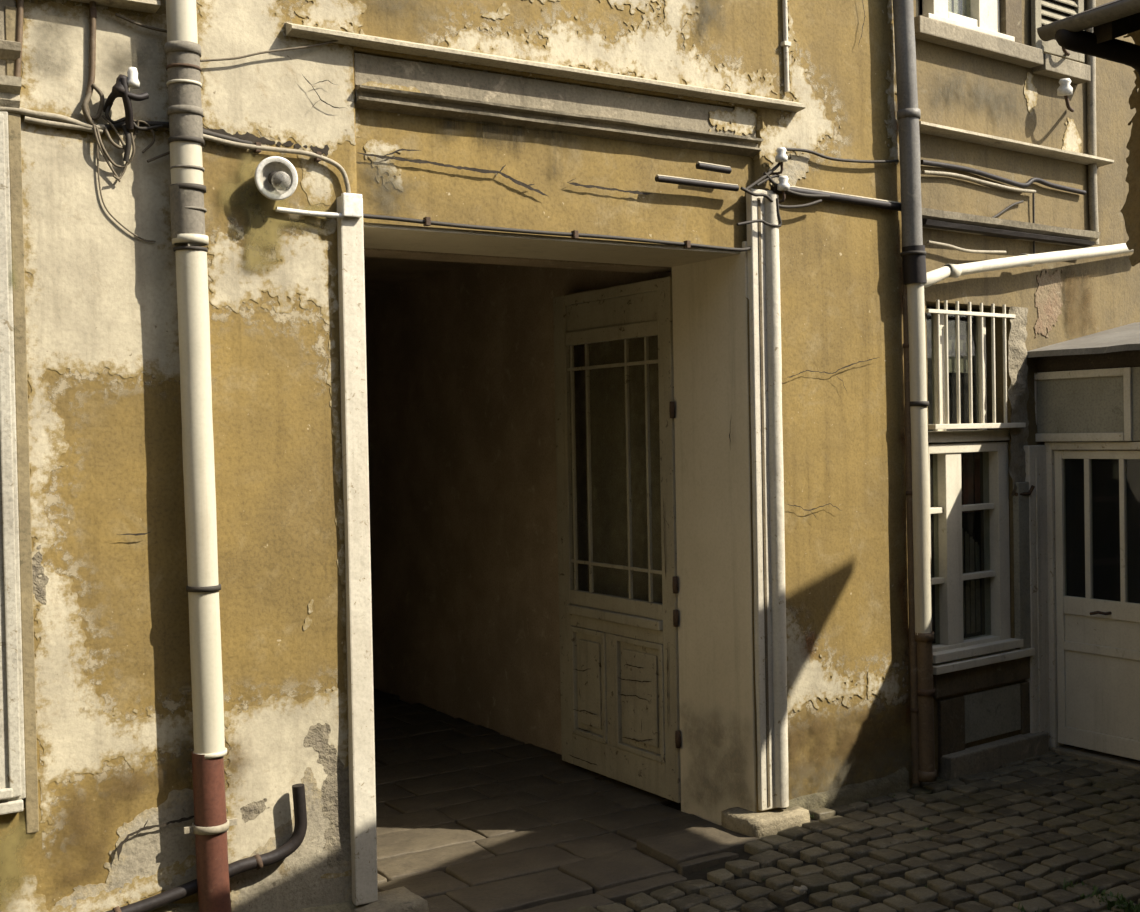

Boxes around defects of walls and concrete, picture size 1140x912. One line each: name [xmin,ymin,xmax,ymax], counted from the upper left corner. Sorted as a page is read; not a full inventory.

crack [304,77,339,109]
peeling [419,0,847,186]
crack [359,148,652,196]
peeling [196,0,421,630]
peeling [20,0,194,854]
peeling [786,608,908,729]
peeling [223,642,351,868]
peeling [0,855,196,912]
crack [117,816,194,861]